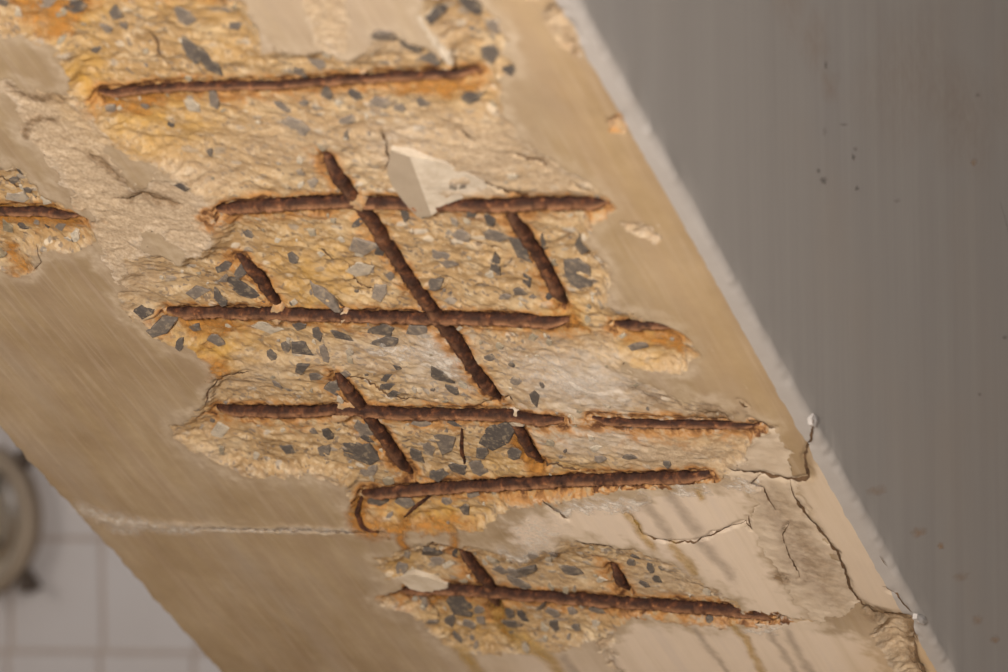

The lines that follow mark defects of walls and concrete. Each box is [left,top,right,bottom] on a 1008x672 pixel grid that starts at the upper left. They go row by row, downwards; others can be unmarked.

spalling [0,0,775,535]
corrosion [511,432,543,473]
spalling [372,427,863,672]
crack [628,512,752,544]
crack [727,417,926,672]